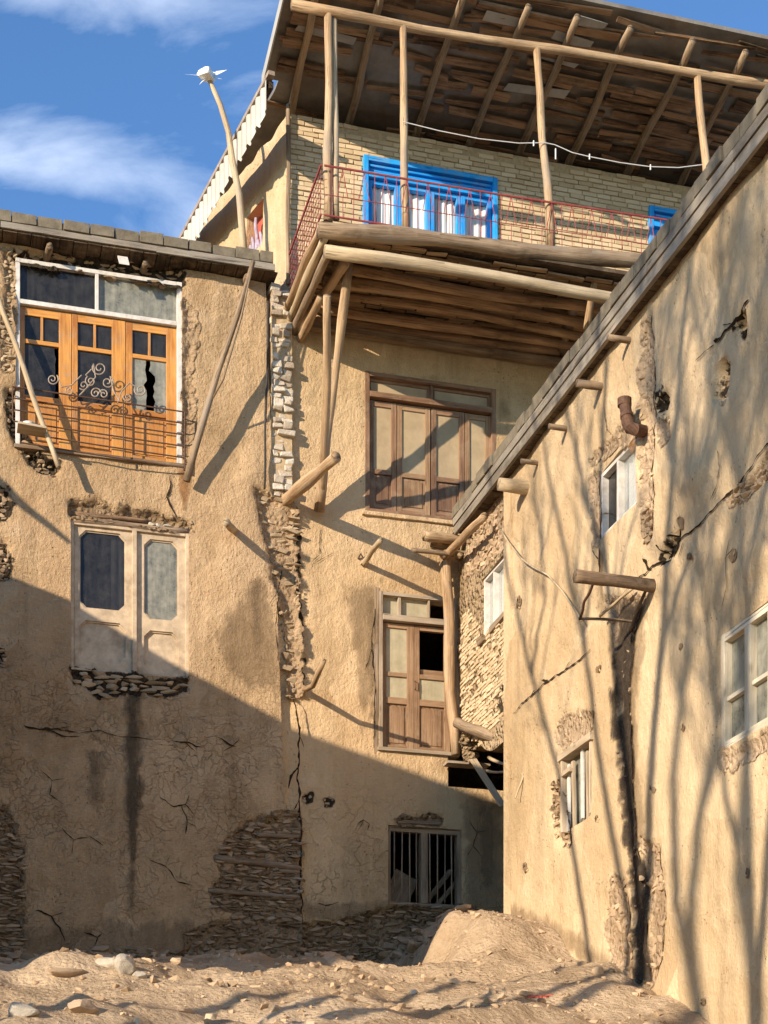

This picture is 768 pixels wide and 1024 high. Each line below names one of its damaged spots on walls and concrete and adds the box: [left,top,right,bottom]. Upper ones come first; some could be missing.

spalling [588,316,693,567]
crack [624,443,768,592]
crack [36,910,101,946]
crack [24,725,146,739]
damp [125,696,144,881]
spalling [208,791,335,929]
crack [269,508,338,919]
crack [514,651,589,713]
spalling [549,779,573,847]
damp [608,598,652,983]
flaking render [604,835,667,990]
flaking render [717,727,768,774]